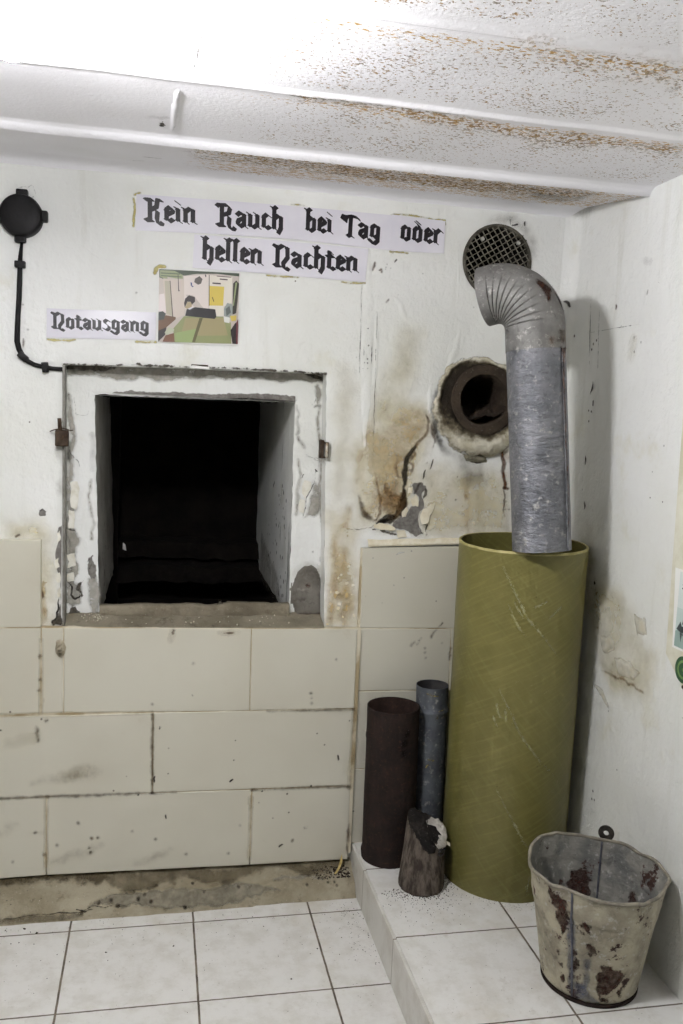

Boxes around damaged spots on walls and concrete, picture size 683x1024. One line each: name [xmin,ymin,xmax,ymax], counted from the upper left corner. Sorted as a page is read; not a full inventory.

rust [578,54,669,76]
rust [300,96,627,148]
rust [195,149,584,196]
flaking render [51,394,100,626]
crack [351,446,433,530]
flaking render [372,482,435,538]
water stain [374,416,442,516]